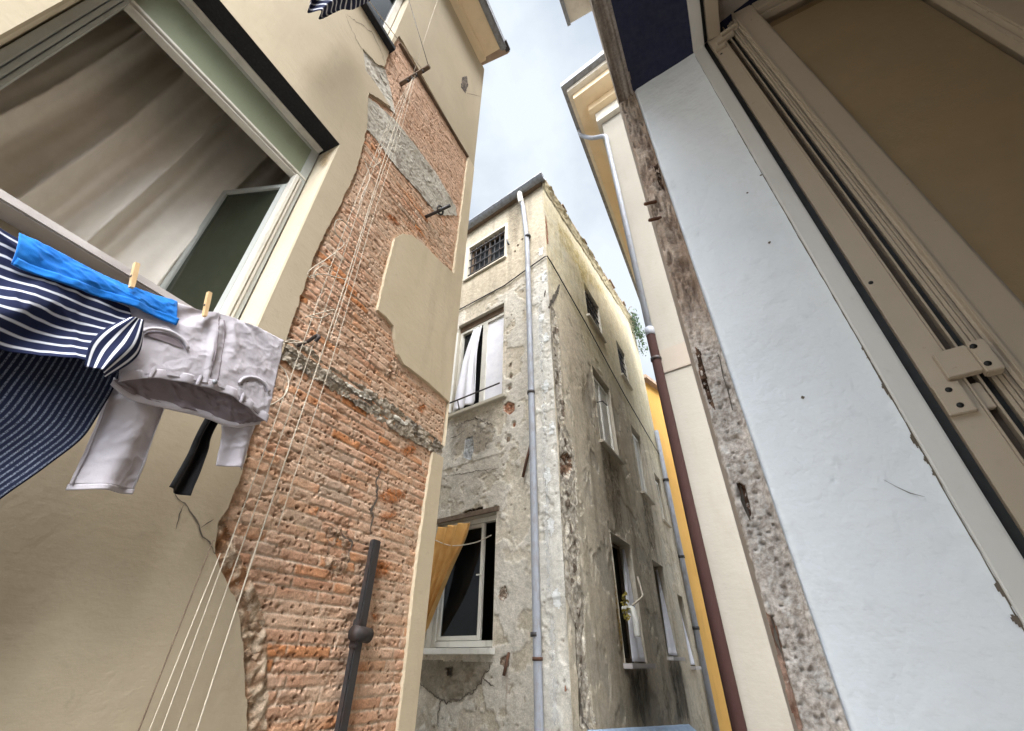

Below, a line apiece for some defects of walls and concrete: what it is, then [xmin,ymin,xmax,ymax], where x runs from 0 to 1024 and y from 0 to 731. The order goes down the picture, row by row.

crack [175,494,216,554]
flaking render [215,38,467,731]
spalling [539,307,596,730]
leakage [673,666,689,718]
spalling [621,91,850,731]